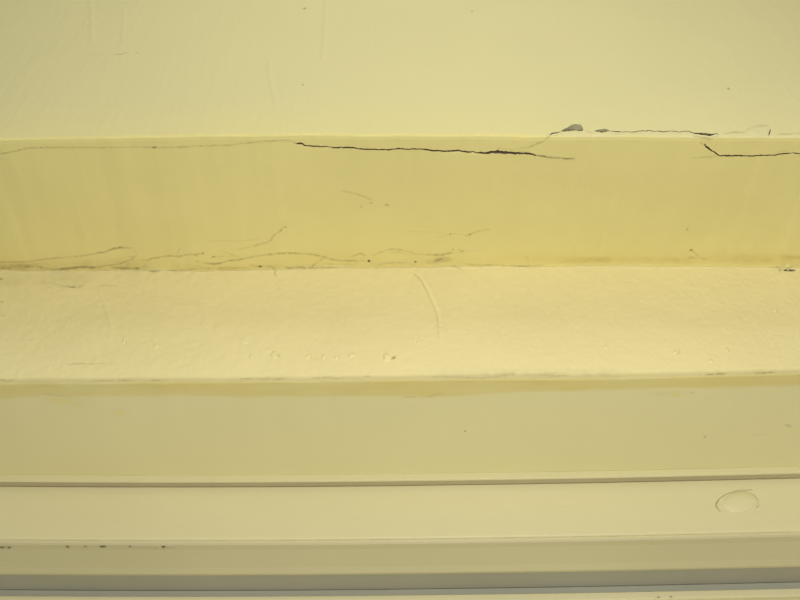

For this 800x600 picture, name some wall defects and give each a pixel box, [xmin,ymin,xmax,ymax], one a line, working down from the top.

crack [296,140,545,158]
crack [610,128,800,159]